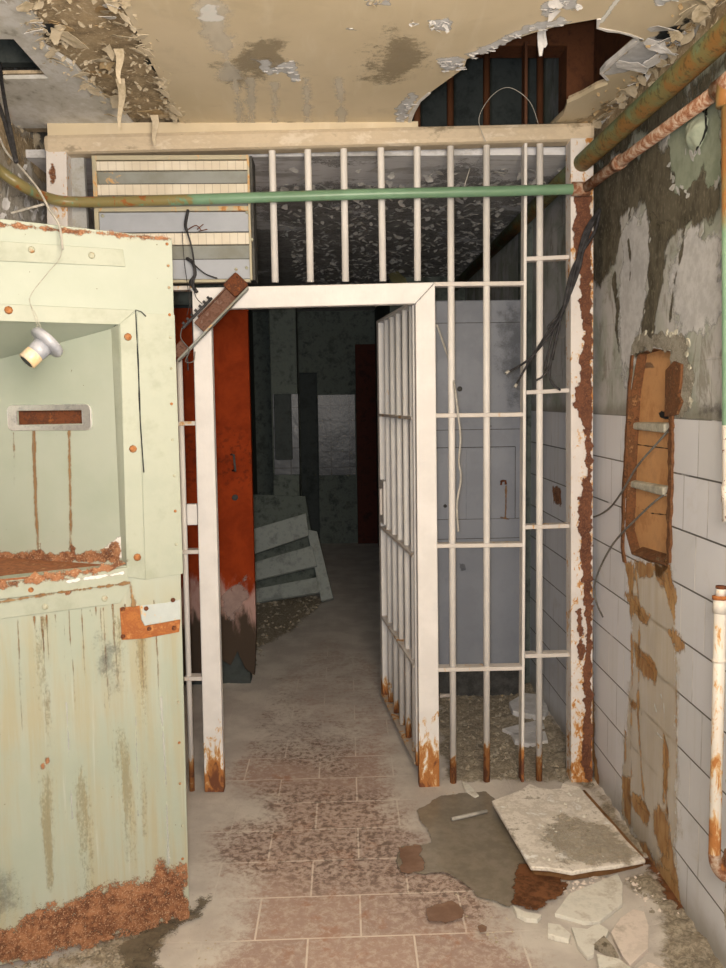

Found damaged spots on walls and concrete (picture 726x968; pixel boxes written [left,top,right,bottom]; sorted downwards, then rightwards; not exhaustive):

peeling [2,0,190,146]
peeling [409,18,453,33]
peeling [665,102,721,198]
peeling [616,207,722,418]
rust [0,430,136,662]
rust [572,196,599,785]
rust [621,355,685,910]
rust [0,858,190,965]
rust [511,863,568,910]